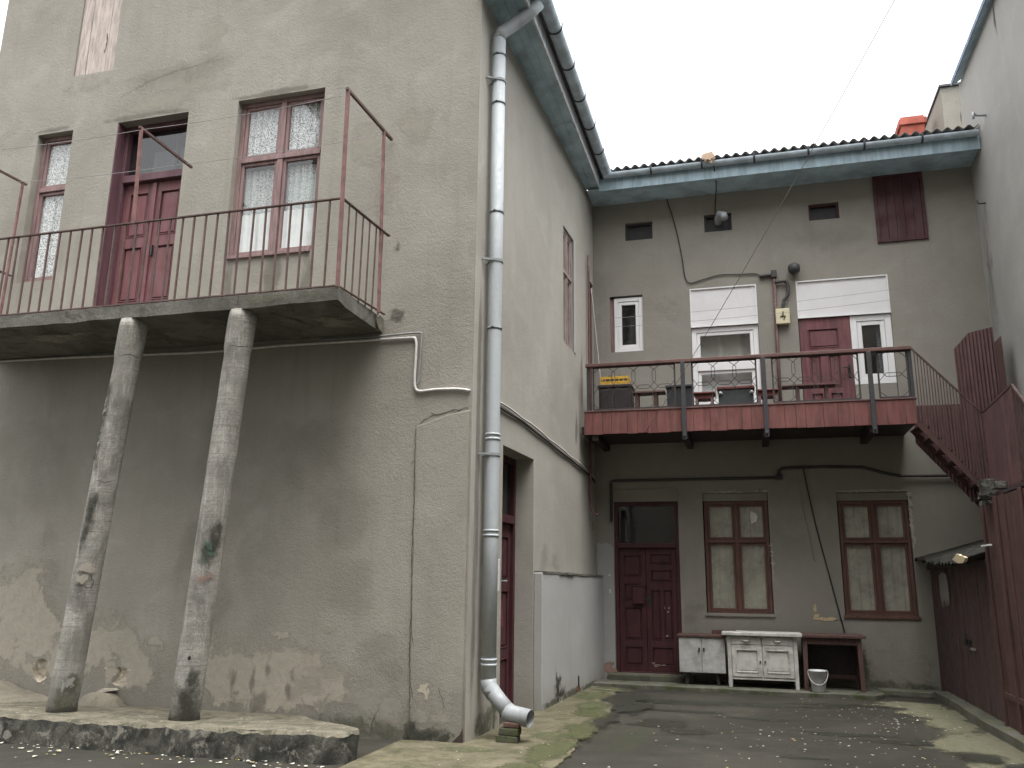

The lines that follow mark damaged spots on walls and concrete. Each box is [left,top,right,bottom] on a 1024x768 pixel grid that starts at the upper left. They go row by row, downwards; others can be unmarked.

peeling [75,562,96,588]
damp [79,493,99,550]
damp [201,523,223,566]
crack [408,407,467,731]
flaking render [32,659,48,683]
flaking render [84,613,164,692]
flaking render [204,631,353,714]